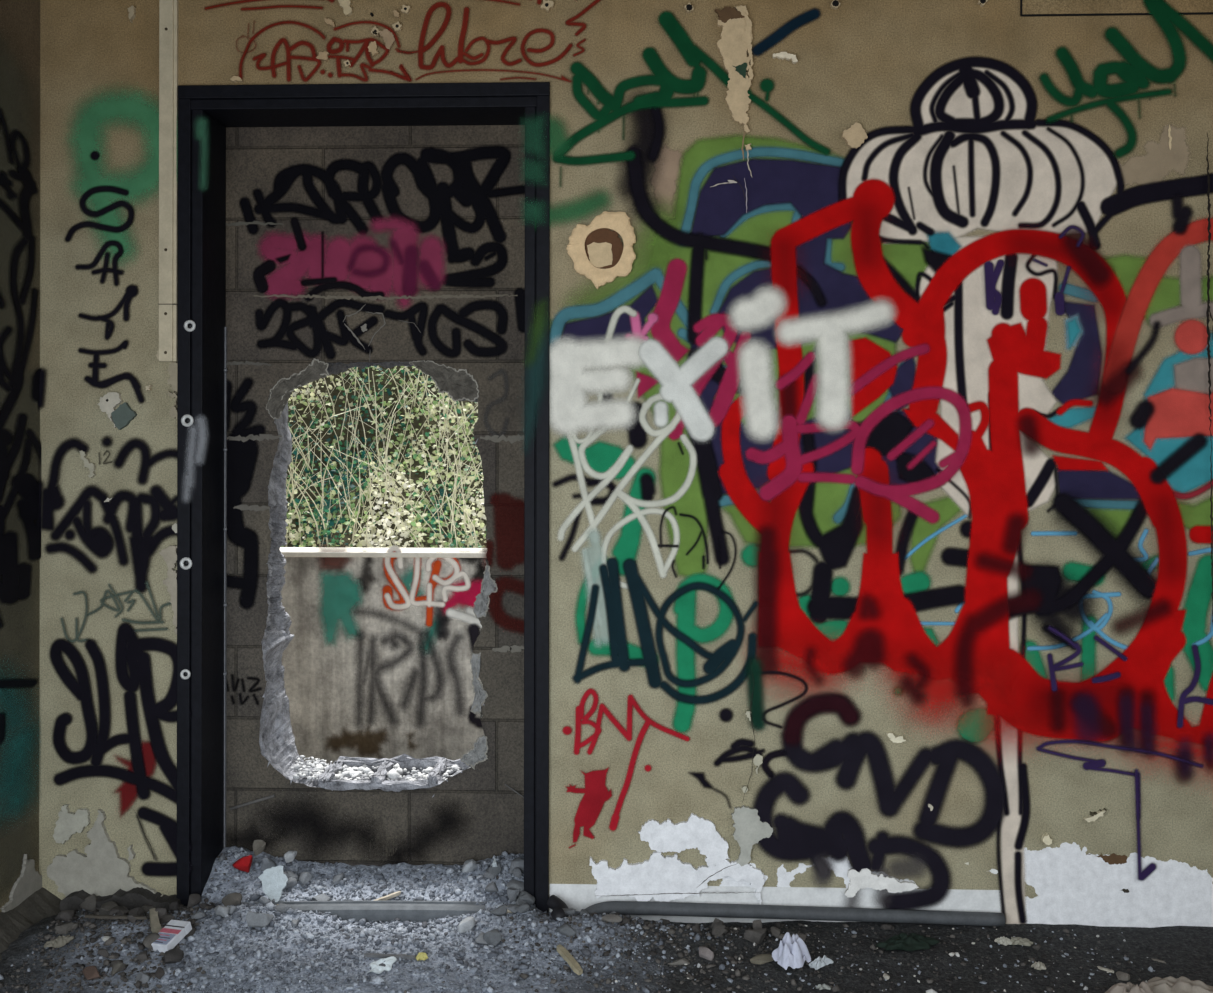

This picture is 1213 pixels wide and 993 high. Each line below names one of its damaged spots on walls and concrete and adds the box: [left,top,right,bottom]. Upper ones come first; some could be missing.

peeling [733,5,754,86]
flaking render [566,211,636,289]
spalling [259,358,488,797]
spalling [473,559,498,622]
peeling [0,804,164,912]
peeling [589,805,919,905]
peeling [1010,833,1213,946]